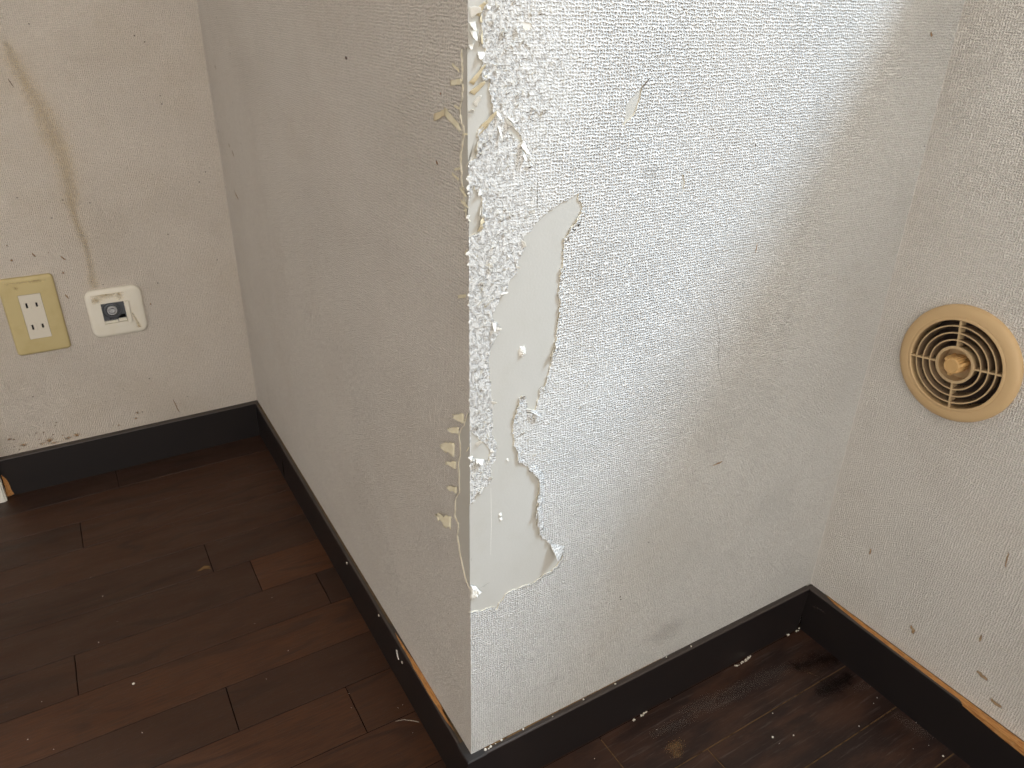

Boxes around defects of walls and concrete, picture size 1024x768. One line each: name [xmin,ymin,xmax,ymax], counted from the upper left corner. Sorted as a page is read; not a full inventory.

peeling [487,0,544,56]
spalling [483,80,552,172]
peeling [440,396,495,478]